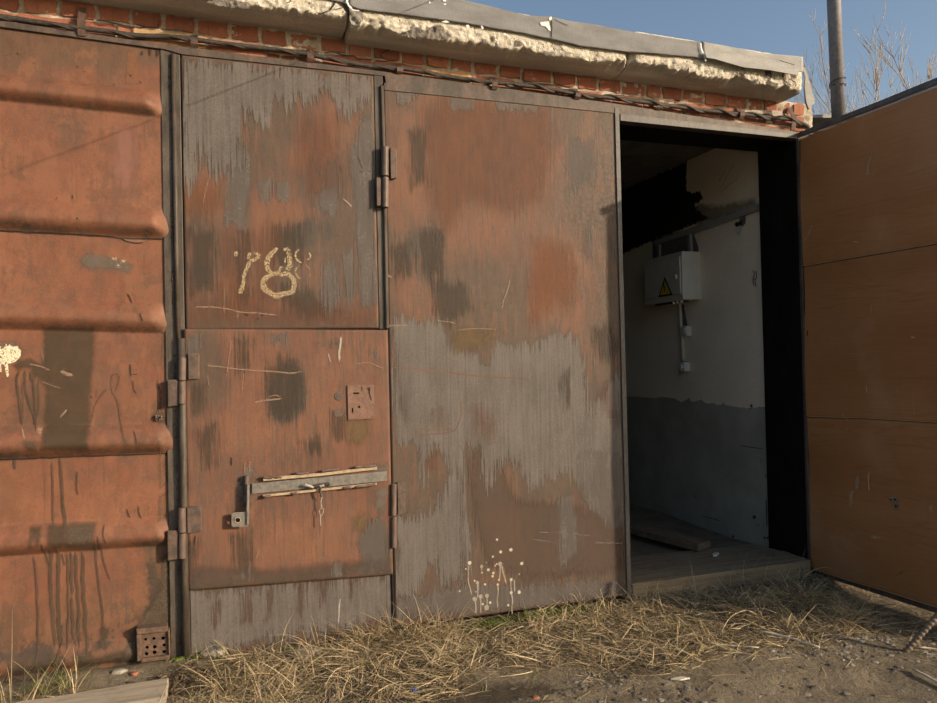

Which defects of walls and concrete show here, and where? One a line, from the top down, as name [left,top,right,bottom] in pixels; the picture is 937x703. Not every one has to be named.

spalling [208,0,250,9]
spalling [346,0,364,26]
spalling [134,28,191,36]
spalling [402,21,451,41]
spalling [755,71,778,88]
peeling [183,48,378,317]
peeling [188,311,626,654]
rust [467,446,625,580]
leakage [30,457,122,666]